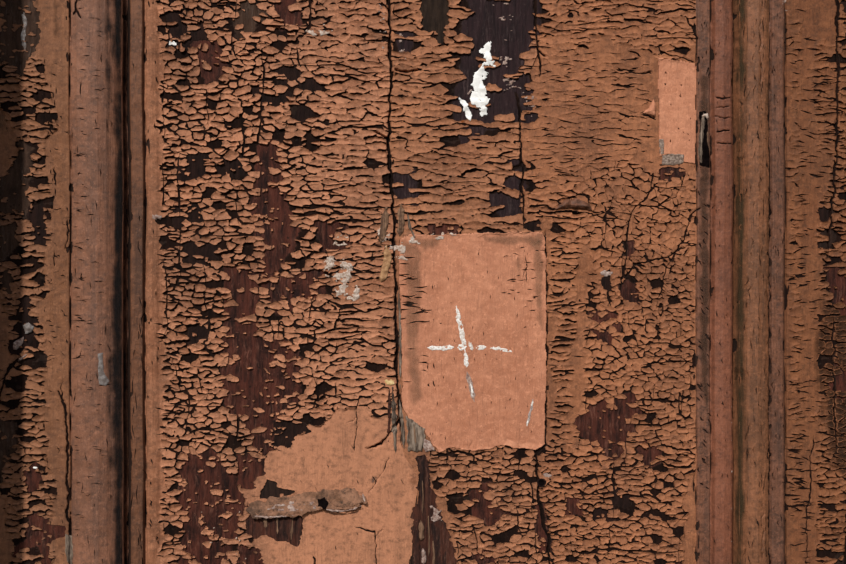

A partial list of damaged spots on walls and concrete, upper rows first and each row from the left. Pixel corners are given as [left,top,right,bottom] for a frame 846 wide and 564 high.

peeling [232,0,303,41]
peeling [419,0,449,44]
peeling [451,0,549,146]
peeling [0,137,47,364]
peeling [218,140,326,455]
peeling [311,221,352,252]
peeling [390,168,419,215]
crack [151,0,701,564]
peeling [485,156,527,217]
peeling [573,392,662,469]
peeling [177,447,367,564]
peeling [410,454,458,564]